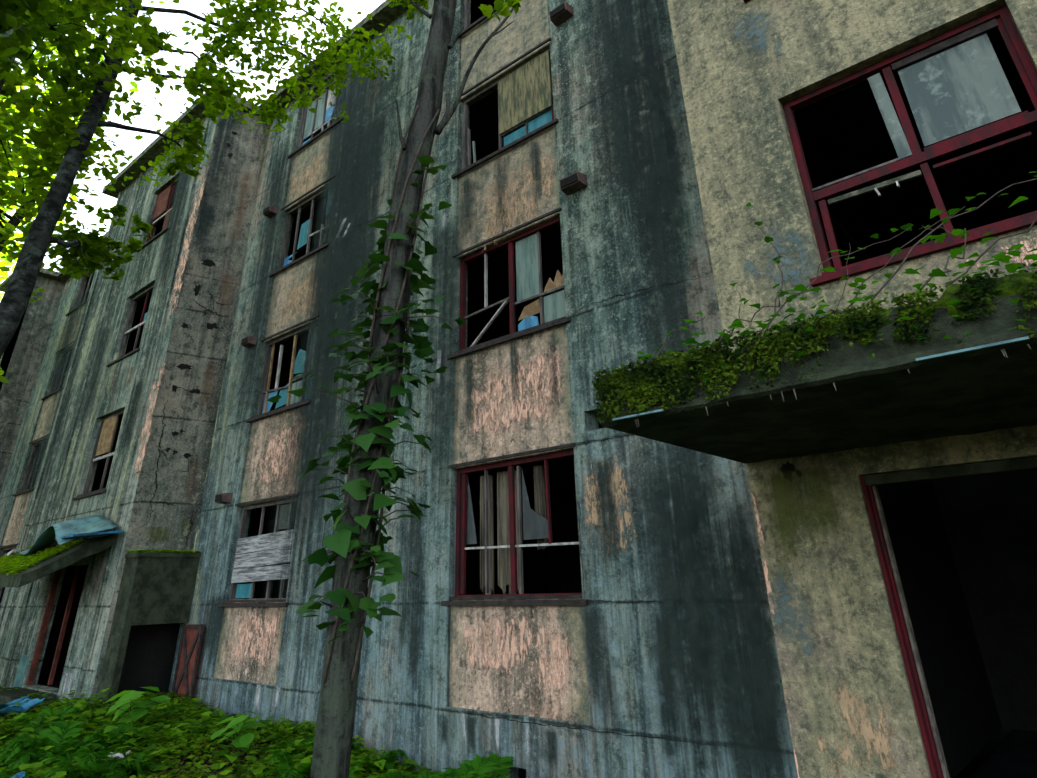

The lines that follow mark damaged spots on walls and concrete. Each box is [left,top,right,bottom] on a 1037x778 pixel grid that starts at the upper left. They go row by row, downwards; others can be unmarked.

damp [160,163,191,277]
damp [211,125,292,450]
damp [598,0,691,356]
damp [28,298,117,489]
damp [114,382,142,510]
damp [597,462,617,554]
damp [585,612,611,705]
damp [643,445,812,777]